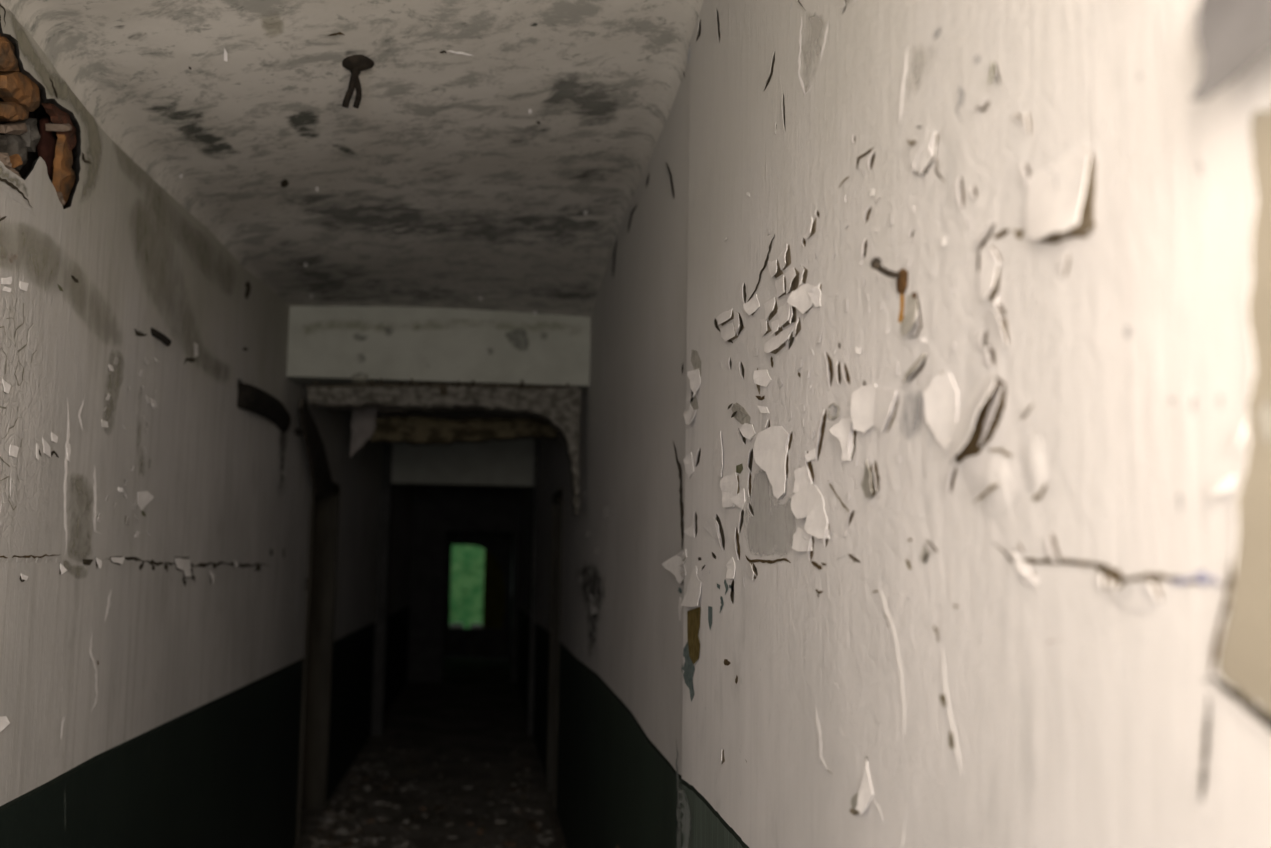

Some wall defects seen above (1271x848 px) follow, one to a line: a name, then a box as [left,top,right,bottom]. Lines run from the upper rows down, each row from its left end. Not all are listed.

spalling [0,4,101,216]
damp [150,106,236,154]
damp [289,112,317,137]
damp [545,74,616,119]
peeling [907,126,977,210]
damp [304,196,597,245]
rust [896,268,908,323]
peeling [662,149,1096,702]
peeling [1208,104,1271,716]
crack [0,549,284,586]
crack [993,533,1271,803]
peeling [850,756,884,824]